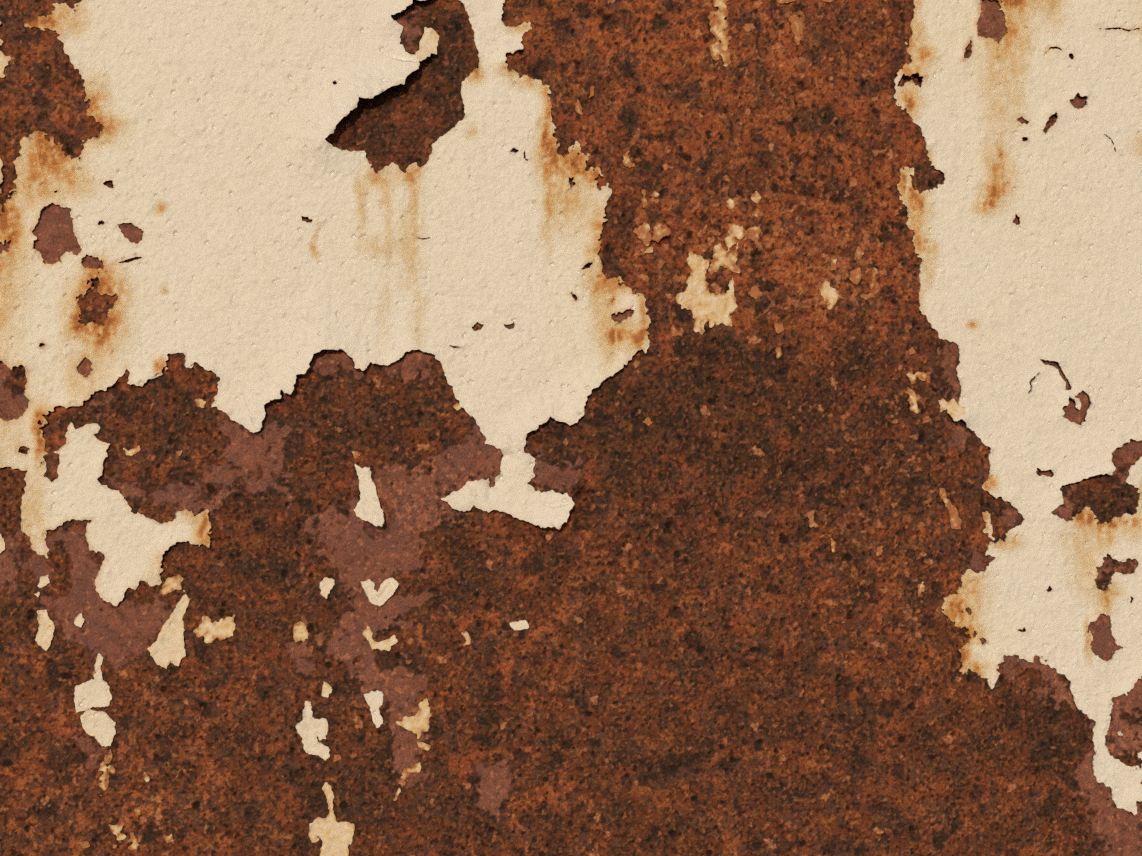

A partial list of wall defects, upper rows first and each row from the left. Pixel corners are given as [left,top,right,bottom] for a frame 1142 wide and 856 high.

rust [992,0,1056,73]
rust [0,0,121,326]
rust [68,262,127,356]
rust [454,0,1024,856]
rust [1047,435,1142,543]
peeling [0,329,577,856]
peeling [988,655,1142,856]